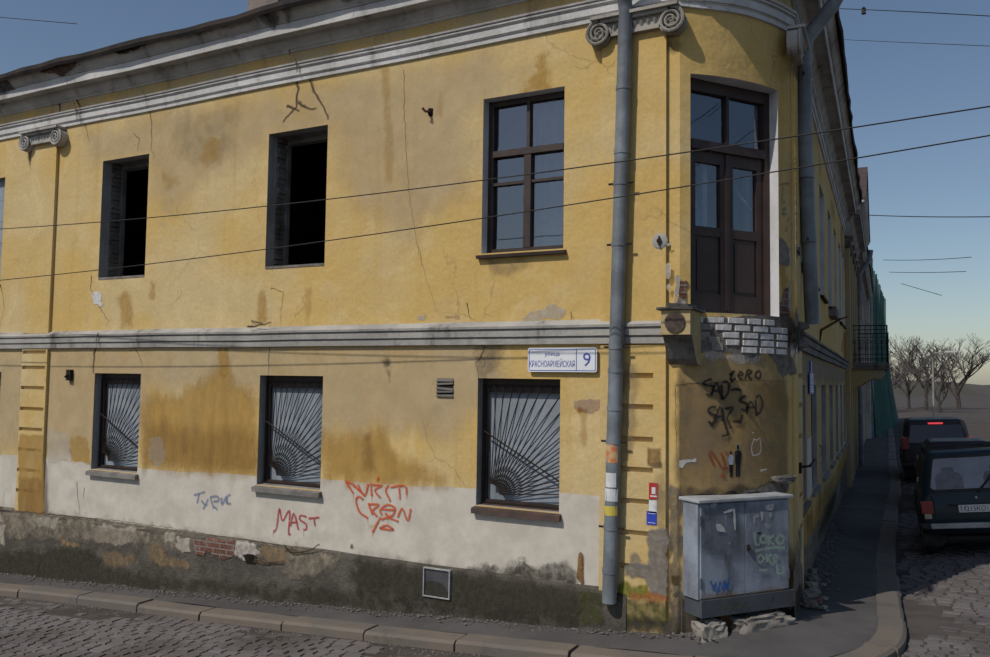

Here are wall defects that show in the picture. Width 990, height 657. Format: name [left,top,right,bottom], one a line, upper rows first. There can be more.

crack [283,50,329,122]
flaking render [700,238,803,378]
damp [144,347,256,472]
damp [327,431,441,483]
spalling [0,513,328,577]
damp [775,464,847,618]
damp [665,591,701,637]